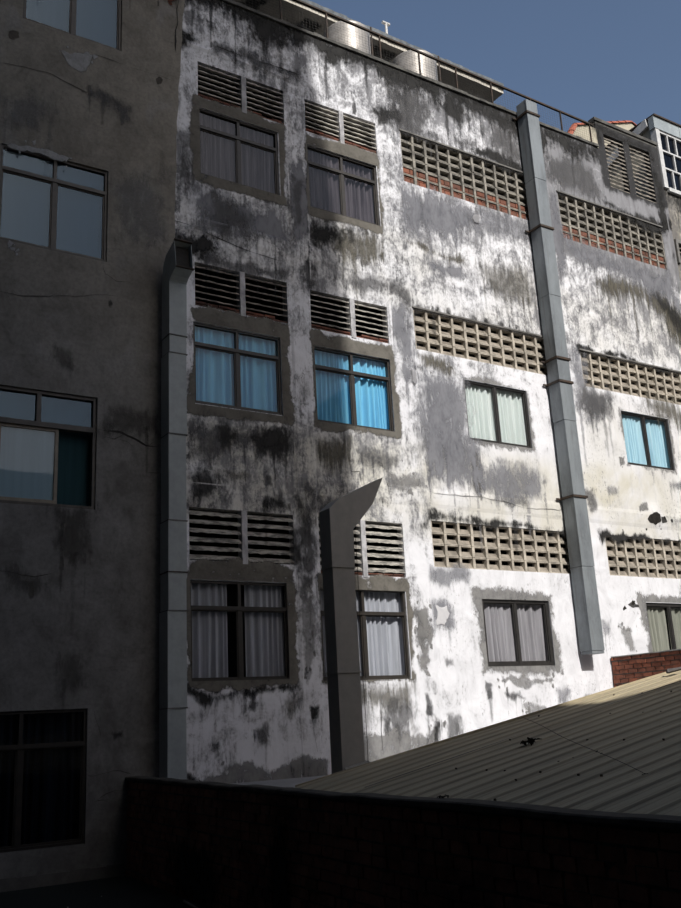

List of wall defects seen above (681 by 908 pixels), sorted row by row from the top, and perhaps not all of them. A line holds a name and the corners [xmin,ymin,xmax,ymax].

leakage [172,0,524,175]
peeling [5,140,72,167]
leakage [175,133,541,506]
leakage [569,343,670,424]
leakage [263,482,336,596]
leakage [187,683,303,716]
leakage [257,724,269,745]
leakage [361,683,412,735]
leakage [426,695,461,741]